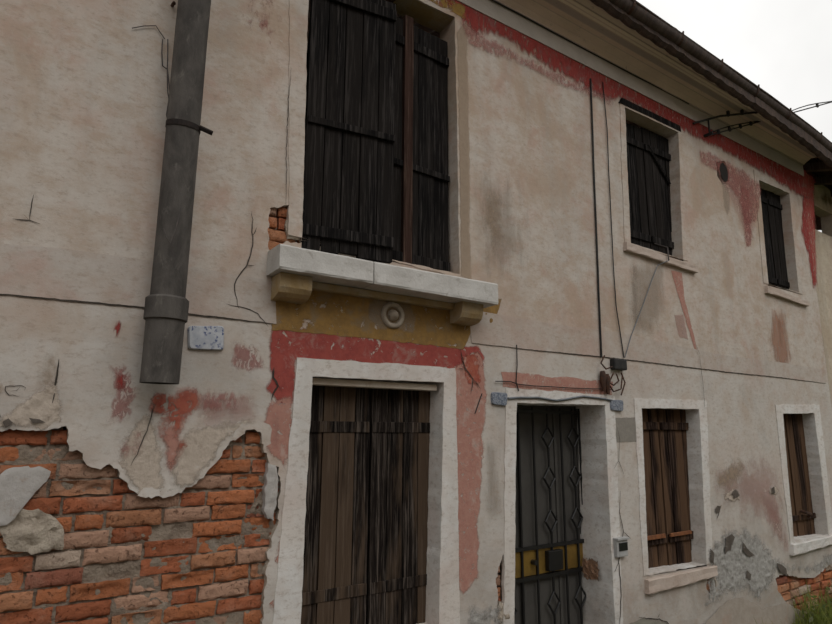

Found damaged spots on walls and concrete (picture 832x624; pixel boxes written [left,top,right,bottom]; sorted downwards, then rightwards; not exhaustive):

peeling [431,0,817,286]
spalling [268,207,299,250]
peeling [483,299,501,323]
spalling [0,290,487,624]
spalling [706,529,832,614]